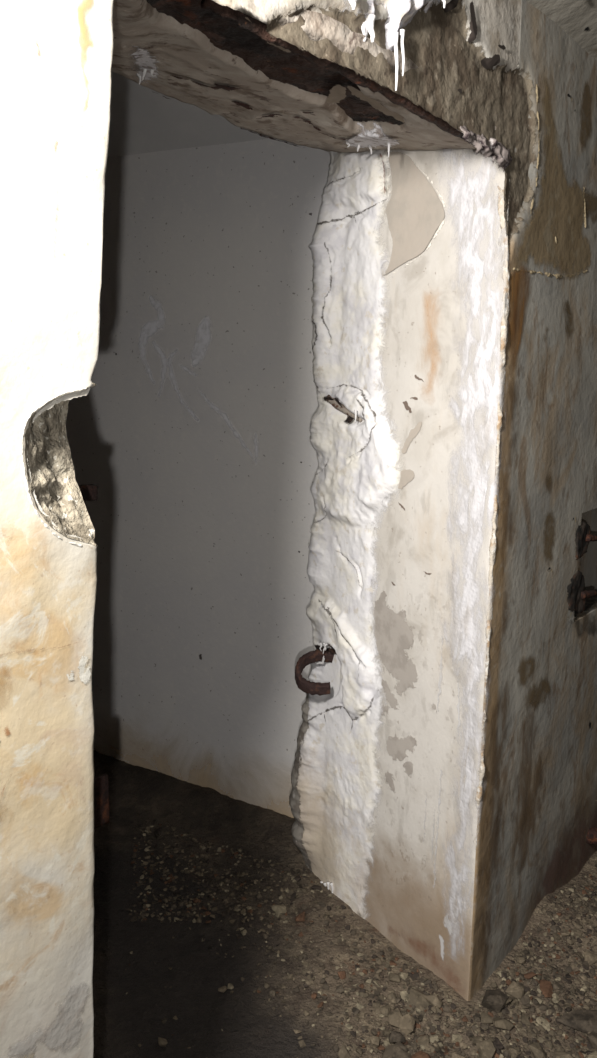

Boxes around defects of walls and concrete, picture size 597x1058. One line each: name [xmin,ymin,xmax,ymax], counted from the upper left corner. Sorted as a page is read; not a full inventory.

rust [170,75,282,118]
rust [201,0,475,146]
spalling [266,0,591,279]
water stain [580,84,591,146]
crack [311,204,376,452]
water stain [565,302,573,335]
spalling [20,383,98,547]
water stain [544,513,555,560]
crack [319,601,360,664]
crack [309,698,373,729]
water stain [518,658,550,707]
peeling [8,983,89,1058]